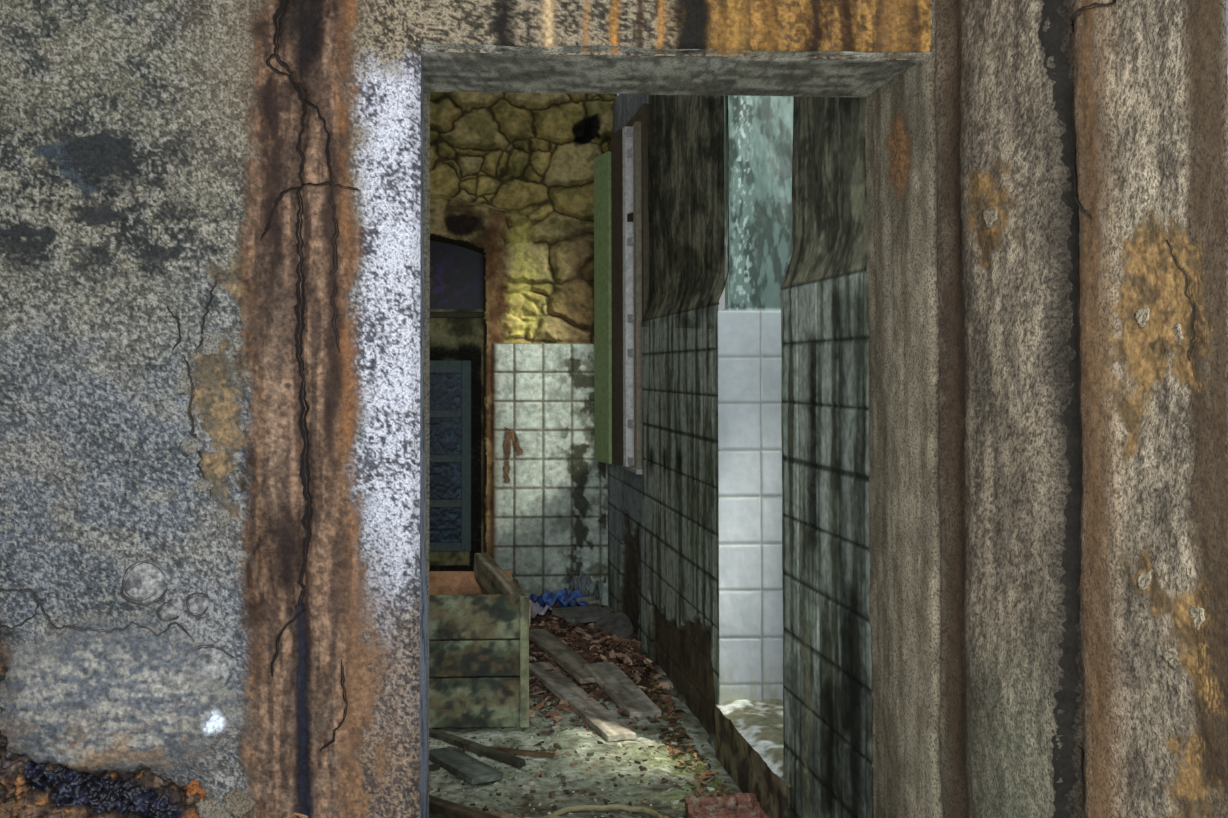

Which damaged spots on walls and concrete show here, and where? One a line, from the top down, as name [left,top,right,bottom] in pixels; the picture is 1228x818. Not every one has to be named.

rust [543,0,554,47]
rust [705,0,931,56]
damp [0,221,56,258]
damp [35,124,196,266]
crack [260,0,361,676]
crack [1166,239,1198,361]
rust [240,0,381,818]
crack [1038,0,1116,818]
crack [320,659,348,751]
spalling [0,736,142,818]
spalling [93,768,257,818]